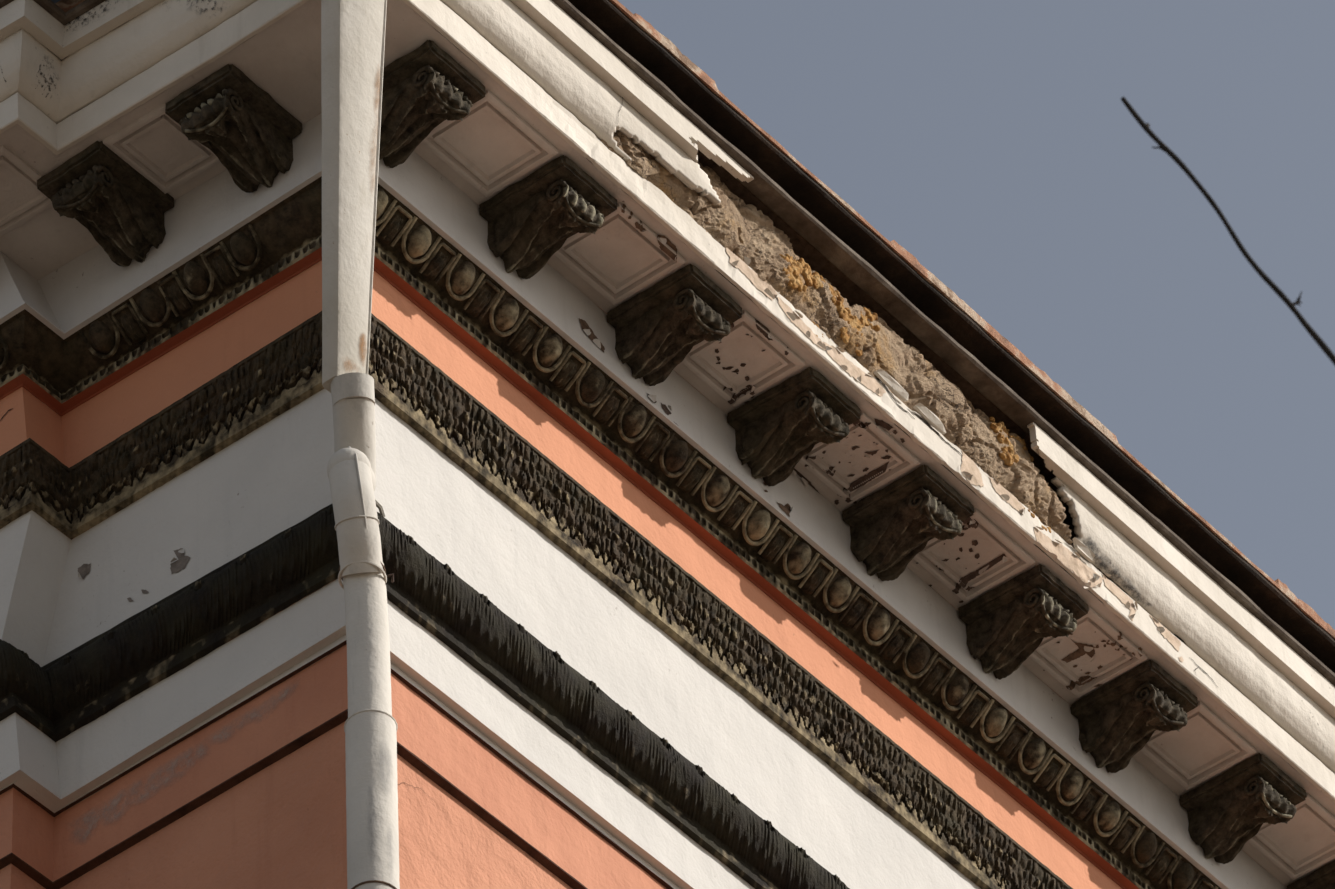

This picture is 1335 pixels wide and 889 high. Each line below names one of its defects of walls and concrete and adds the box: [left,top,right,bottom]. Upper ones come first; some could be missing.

peeling [579,318,605,352]
spalling [600,130,1184,690]
peeling [170,548,190,574]